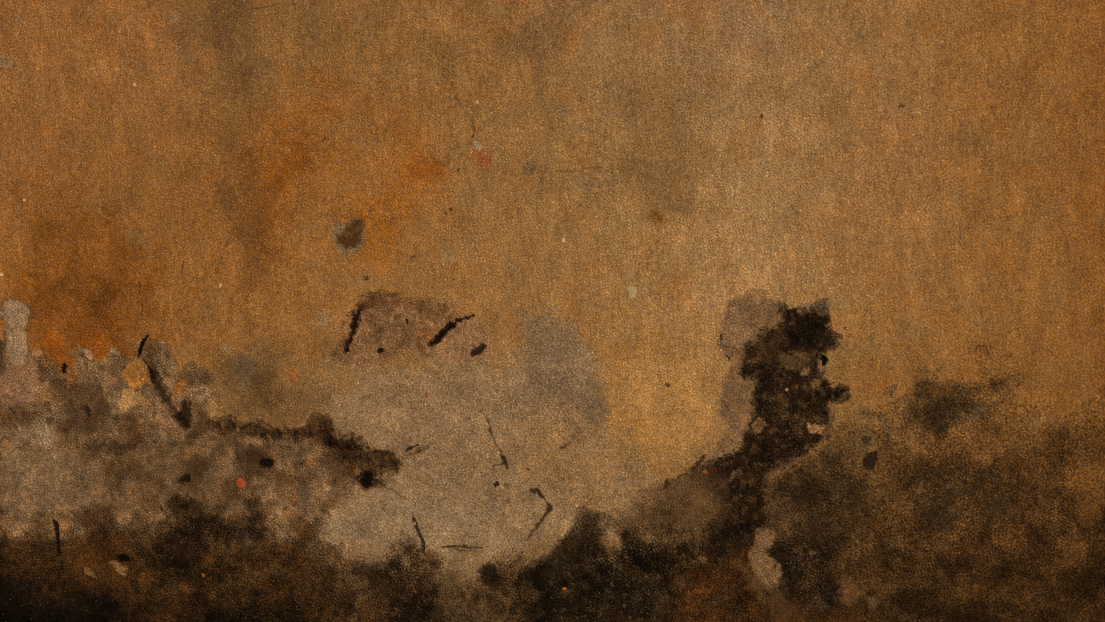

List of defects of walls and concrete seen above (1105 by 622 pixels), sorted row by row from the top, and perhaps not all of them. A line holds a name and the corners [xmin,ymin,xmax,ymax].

spalling [0,288,663,583]
spalling [330,216,366,256]
damp [0,298,1105,622]
spalling [698,289,832,474]